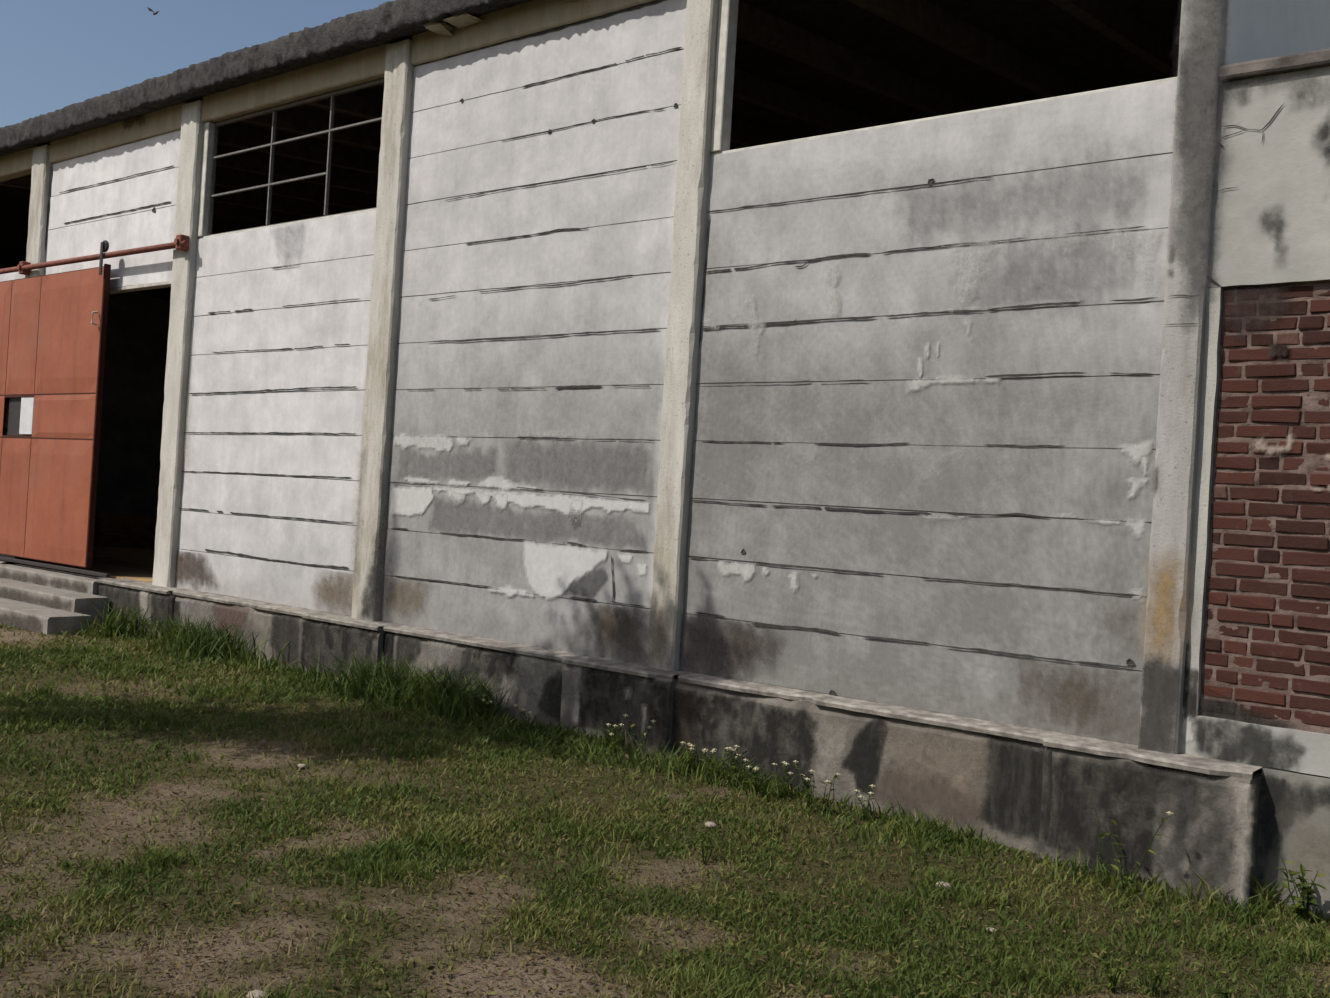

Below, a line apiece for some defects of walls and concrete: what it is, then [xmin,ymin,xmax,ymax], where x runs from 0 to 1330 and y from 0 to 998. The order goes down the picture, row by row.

crack [1216,63,1283,147]
leakage [1172,0,1246,316]
leakage [1317,122,1330,161]
leakage [1263,214,1283,248]
peeling [395,434,468,451]
leakage [1255,435,1294,454]
peeling [391,476,649,527]
peeling [489,541,647,599]
leakage [271,476,1330,904]